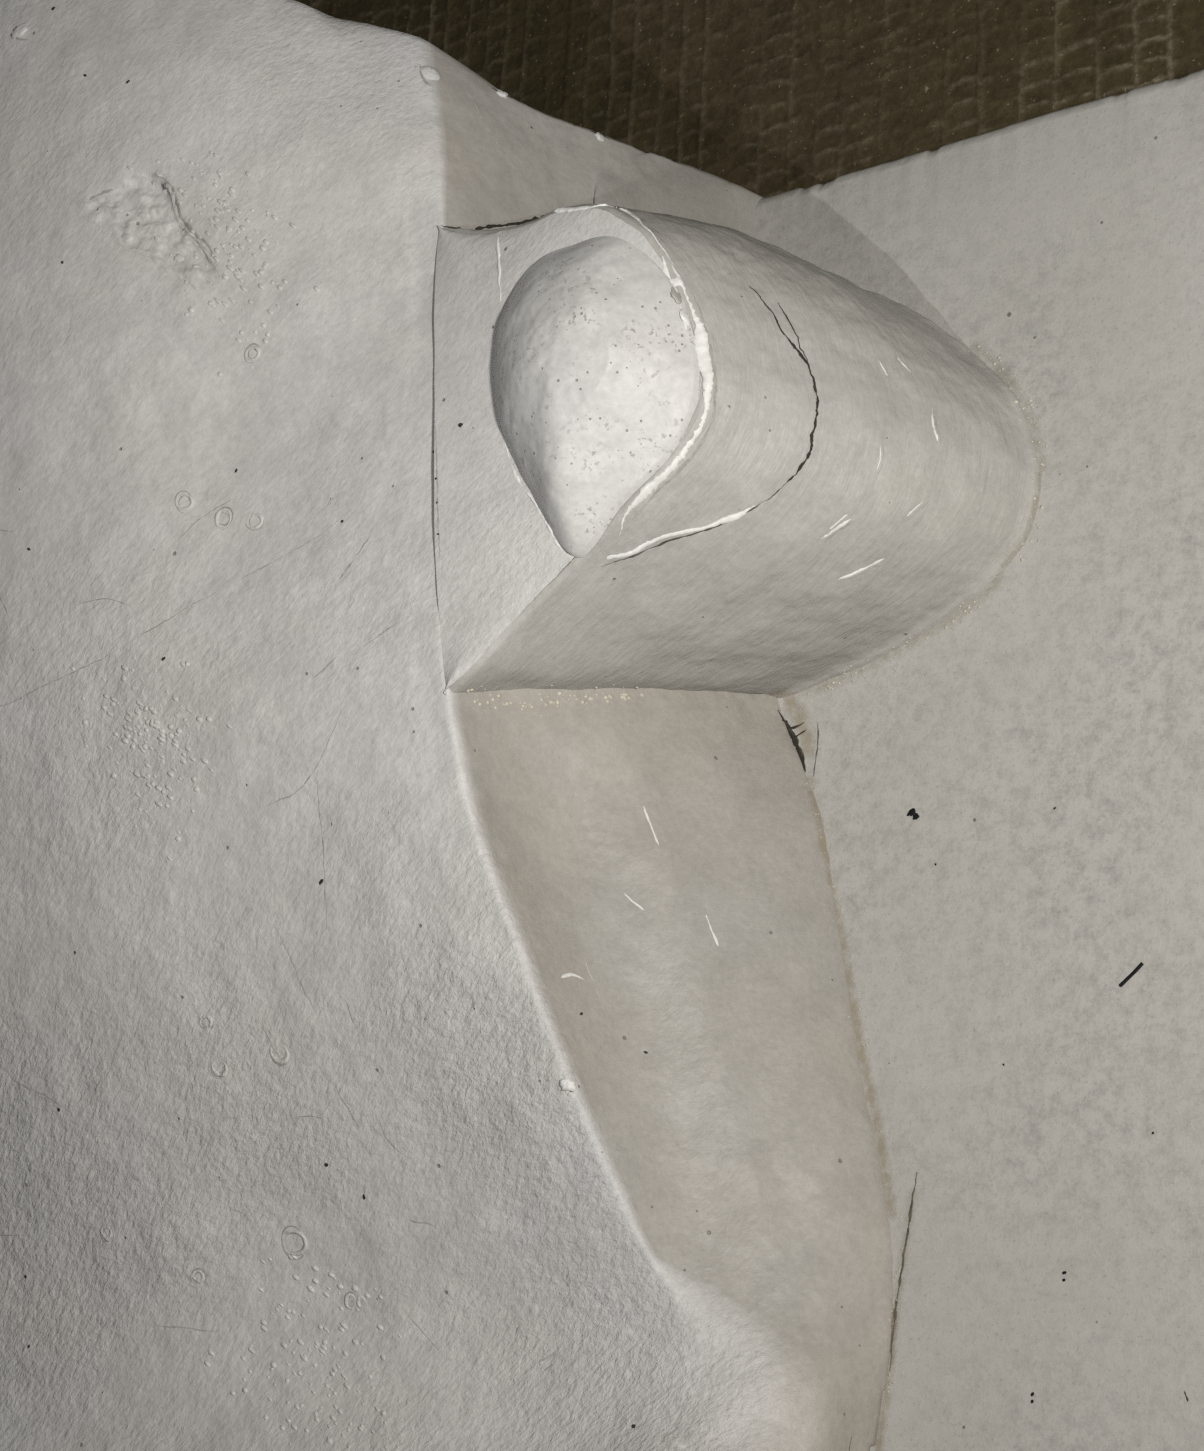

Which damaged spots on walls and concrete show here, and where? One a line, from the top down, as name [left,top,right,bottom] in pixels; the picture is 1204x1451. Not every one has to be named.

peeling [441,204,717,534]